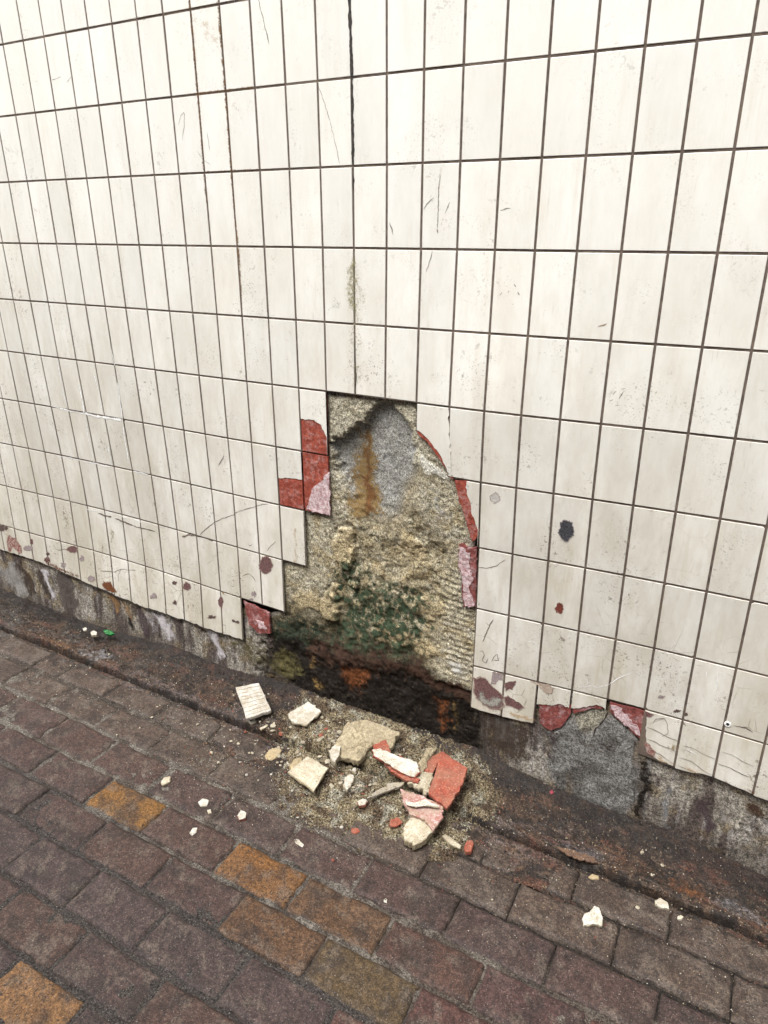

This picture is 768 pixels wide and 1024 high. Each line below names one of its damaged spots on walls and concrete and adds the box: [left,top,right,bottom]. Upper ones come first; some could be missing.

rust [345,427,384,525]
damp [0,559,80,613]
damp [128,603,175,640]
efflorescence [208,630,226,659]
spalling [232,388,524,750]
damp [272,632,533,759]
spalling [530,680,656,757]
damp [634,761,670,817]
crack [647,718,768,802]